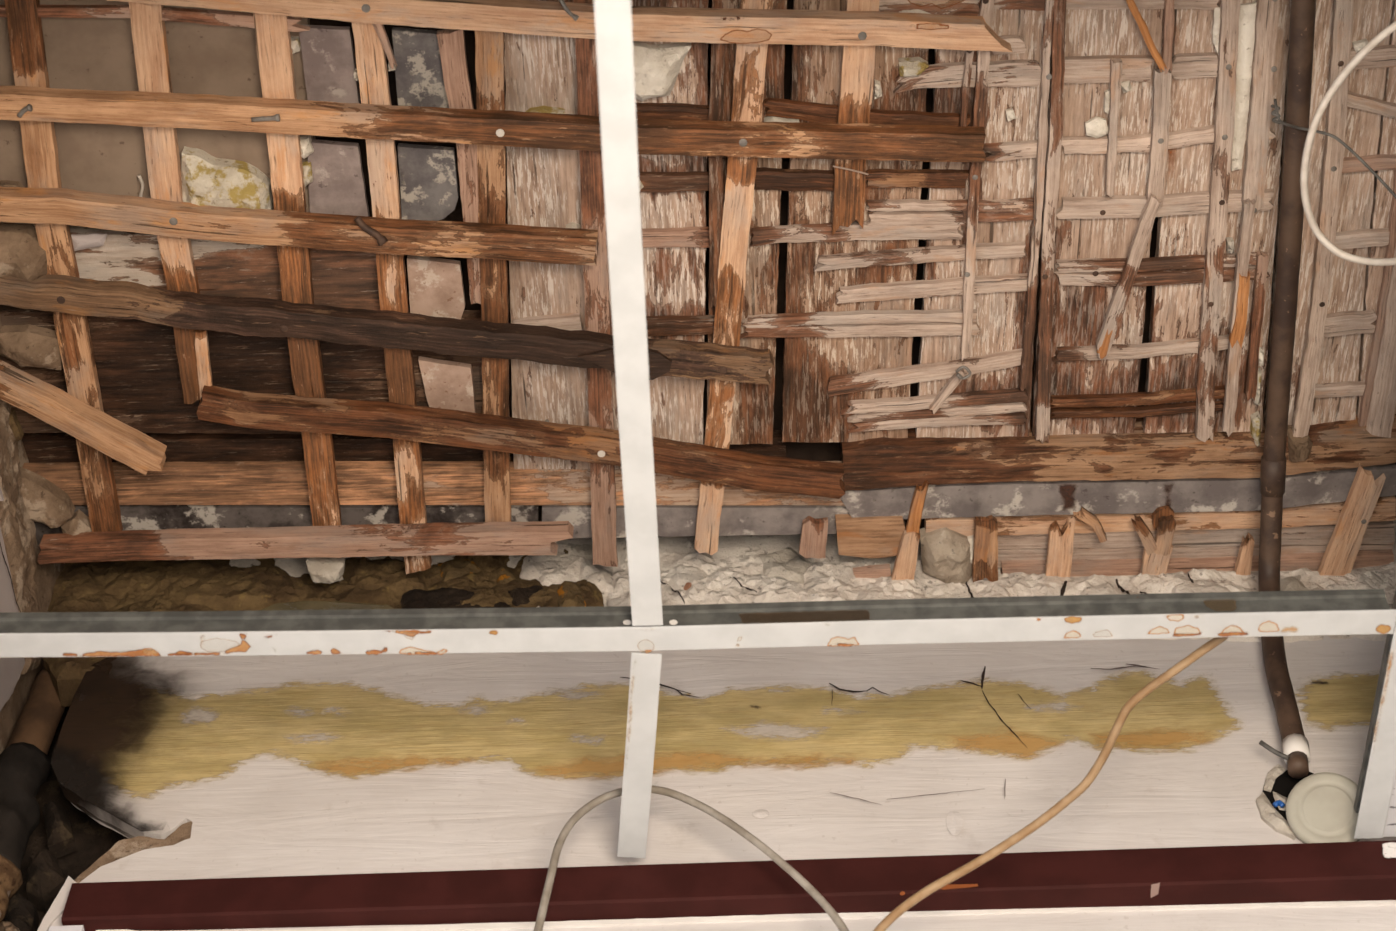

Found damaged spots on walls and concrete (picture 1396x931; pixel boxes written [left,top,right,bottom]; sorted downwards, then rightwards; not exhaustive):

flaking render [0,399,631,612]
flaking render [660,525,1259,606]
corrosion [63,633,251,657]
corrosion [365,630,447,655]
corrosion [1148,599,1297,637]
water stain [56,657,629,798]
crack [829,683,890,700]
water stain [653,671,1241,773]
crack [961,666,1031,746]
water stain [1296,674,1379,729]
crack [830,779,1006,805]
spalling [0,801,193,931]